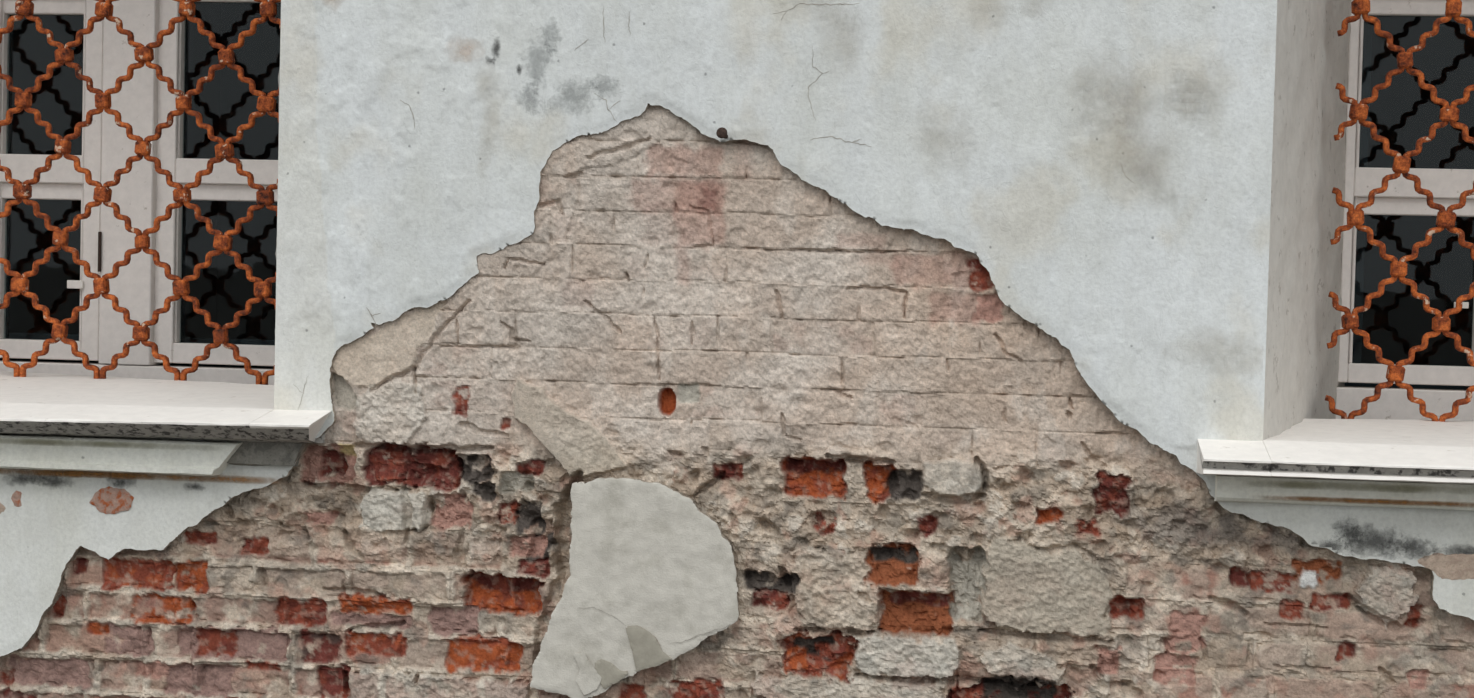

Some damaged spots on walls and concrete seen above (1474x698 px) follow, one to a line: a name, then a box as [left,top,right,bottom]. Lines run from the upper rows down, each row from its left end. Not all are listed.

peeling [511,377,627,477]
spalling [1092,469,1134,520]
flaking render [100,556,177,593]
flaking render [173,559,209,595]
spalling [743,569,801,595]
flaking render [129,593,199,626]
spalling [877,589,957,644]
flaking render [6,654,93,692]
flaking render [162,662,236,698]
flaking render [194,626,239,659]
flaking render [218,625,293,664]
spalling [779,629,860,685]